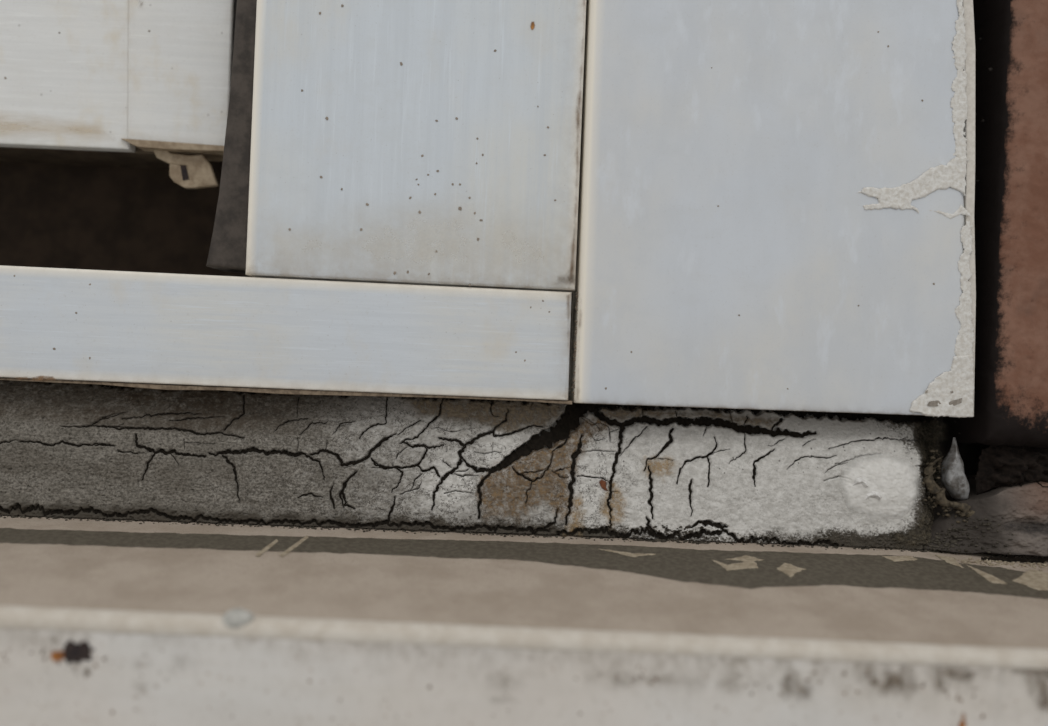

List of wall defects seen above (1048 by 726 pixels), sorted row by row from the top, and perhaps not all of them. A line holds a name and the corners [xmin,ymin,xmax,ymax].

peeling [858,157,975,418]
crack [0,382,932,547]
corrosion [51,650,65,661]